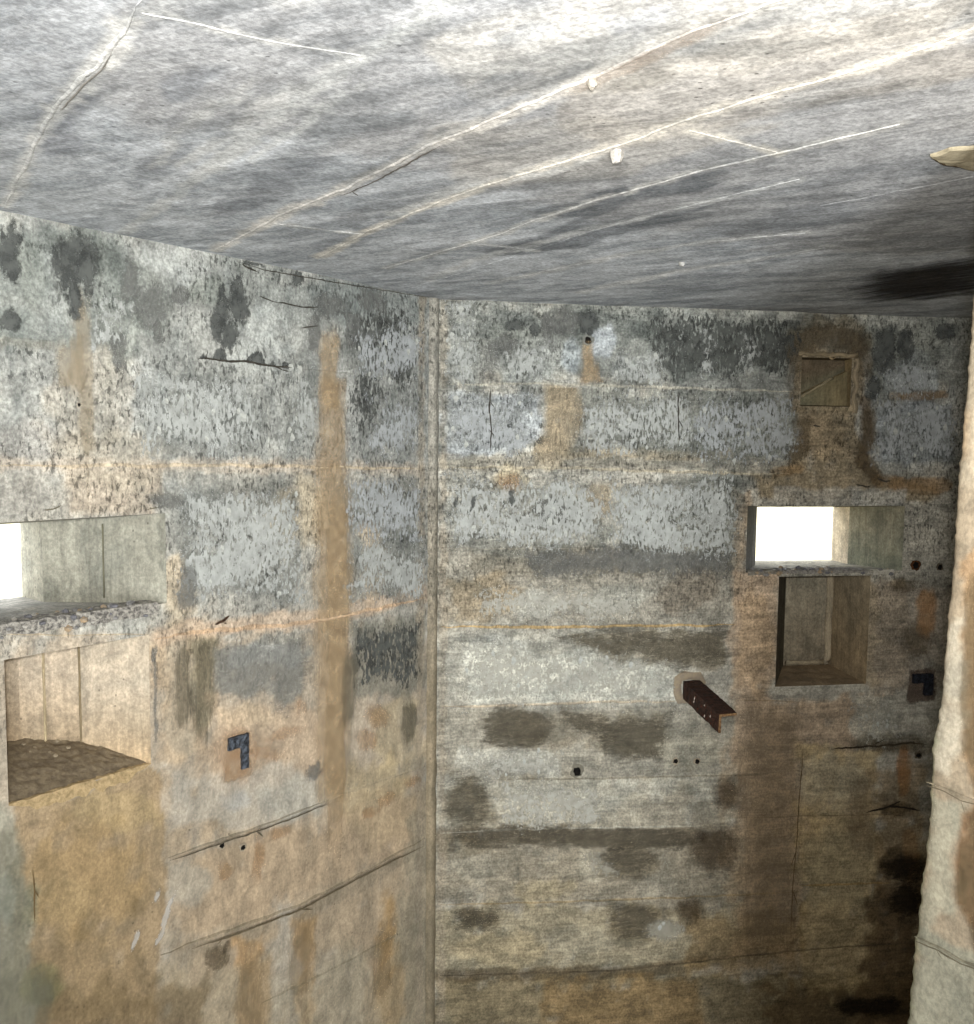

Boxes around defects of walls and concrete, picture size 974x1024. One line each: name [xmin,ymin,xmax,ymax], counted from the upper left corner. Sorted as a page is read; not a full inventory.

crack [60,53,112,111]
crack [341,147,438,196]
damp [0,220,23,284]
damp [50,229,102,320]
damp [0,307,21,332]
damp [200,261,264,360]
crack [198,351,292,372]
damp [247,351,289,369]
damp [355,620,422,690]
crack [834,739,926,749]
damp [449,778,684,875]
damp [880,854,924,920]